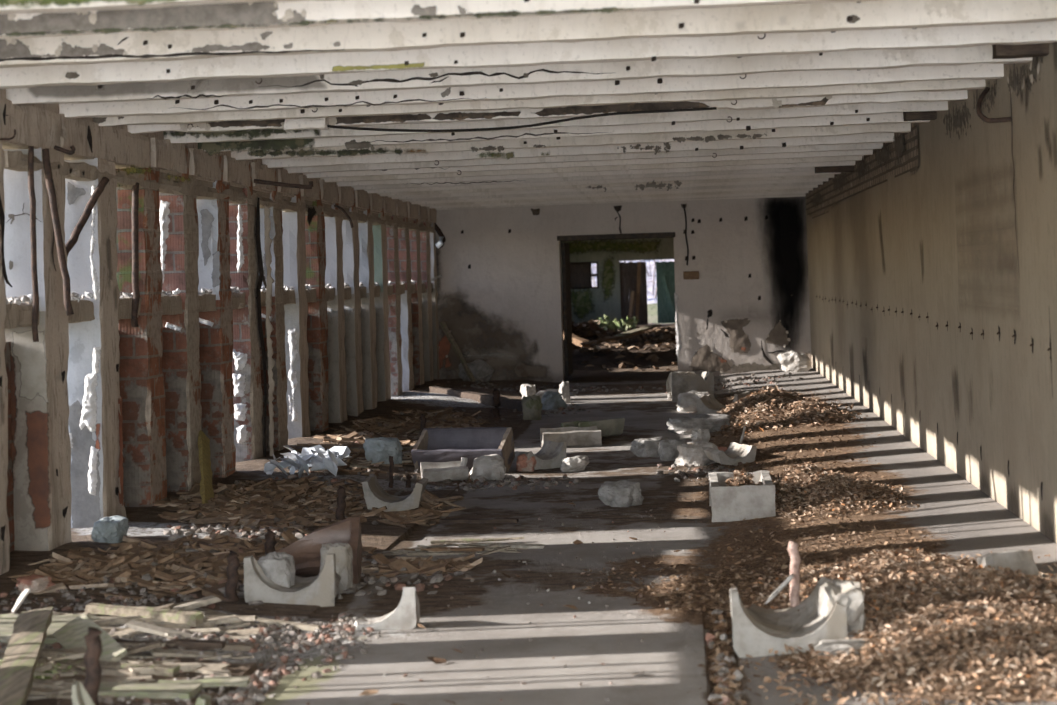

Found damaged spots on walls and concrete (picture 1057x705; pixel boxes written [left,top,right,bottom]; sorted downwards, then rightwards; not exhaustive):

peeling [0,1,307,59]
peeling [411,5,439,16]
spalling [180,119,287,132]
spalling [328,111,521,125]
spalling [535,101,710,117]
spalling [159,200,170,284]
spalling [674,293,682,358]
flaking render [690,310,780,374]
flaking render [764,320,790,347]
peeling [10,330,51,529]
peeling [68,347,101,528]